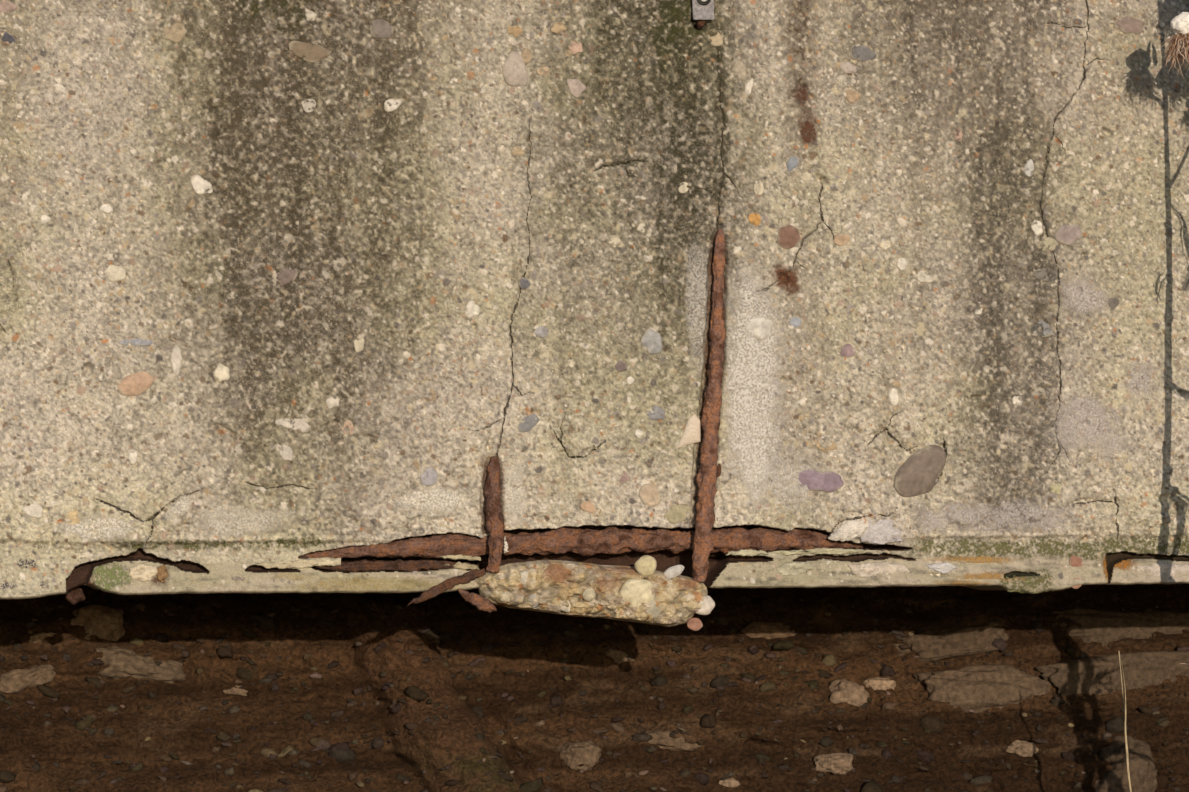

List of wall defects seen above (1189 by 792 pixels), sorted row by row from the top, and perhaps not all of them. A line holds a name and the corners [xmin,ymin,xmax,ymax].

damp [188,0,404,439]
crack [475,122,532,457]
spalling [229,229,958,613]
damp [561,0,733,361]
rust [693,251,726,528]
damp [724,265,812,505]
rust [776,265,799,293]
crack [743,183,836,299]
rust [799,118,816,143]
crack [1039,0,1111,473]
spalling [66,548,209,593]
spalling [1105,551,1189,584]